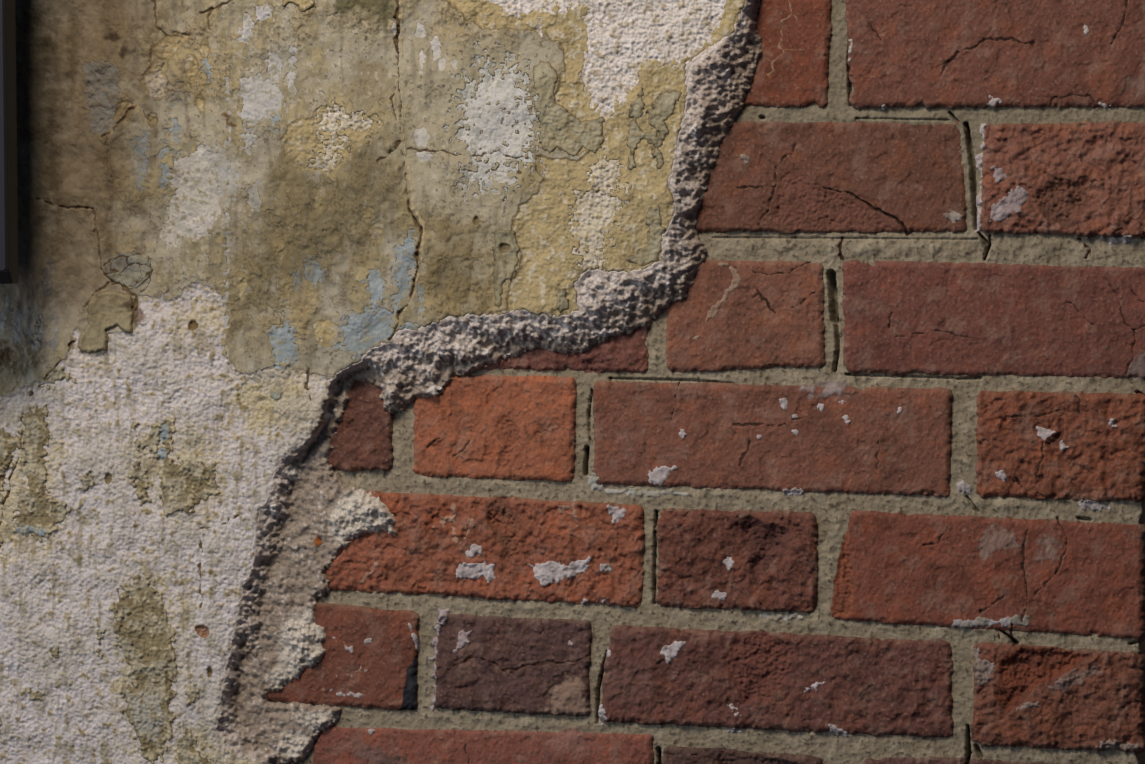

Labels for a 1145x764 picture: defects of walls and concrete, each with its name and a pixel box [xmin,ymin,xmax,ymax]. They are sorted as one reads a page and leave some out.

water stain [335,0,394,23]
crack [377,0,531,341]
crack [0,341,76,547]
peeling [0,0,762,764]